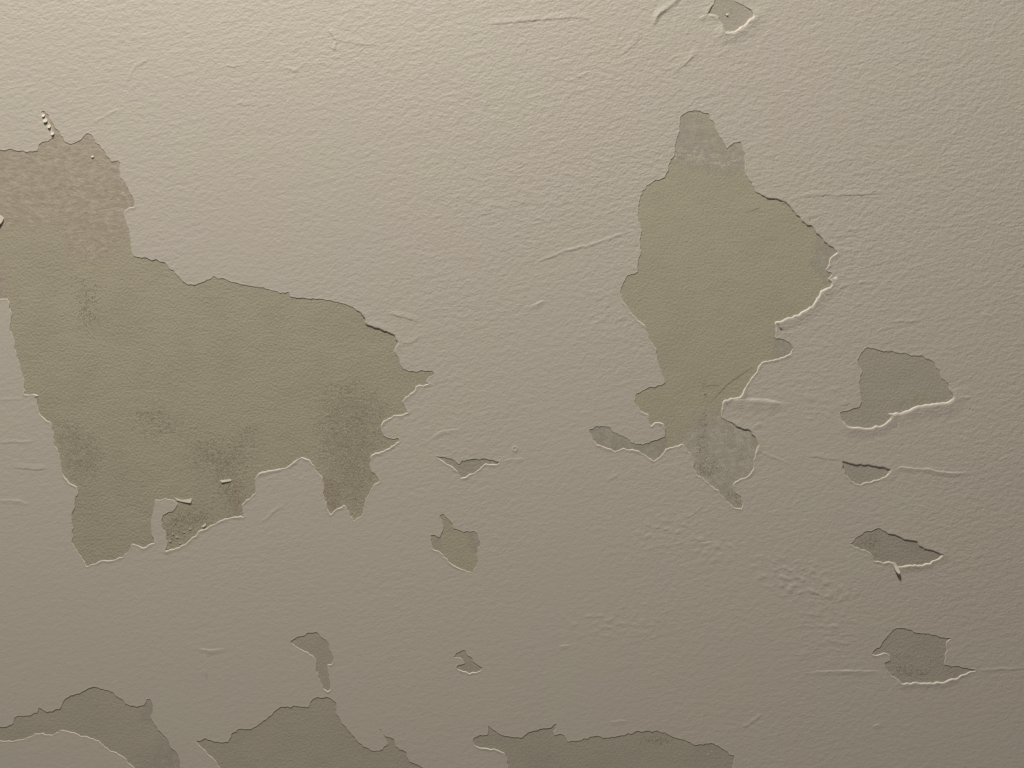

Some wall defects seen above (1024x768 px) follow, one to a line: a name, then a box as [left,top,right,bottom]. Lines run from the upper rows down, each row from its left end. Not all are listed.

peeling [701,0,768,47]
peeling [0,110,436,569]
peeling [588,109,845,512]
peeling [838,346,967,439]
peeling [434,455,502,481]
peeling [834,453,899,487]
peeling [430,513,482,575]
peeling [848,527,949,574]
peeling [869,627,978,691]
peeling [0,686,182,768]
peeling [194,631,426,768]
peeling [472,723,736,768]